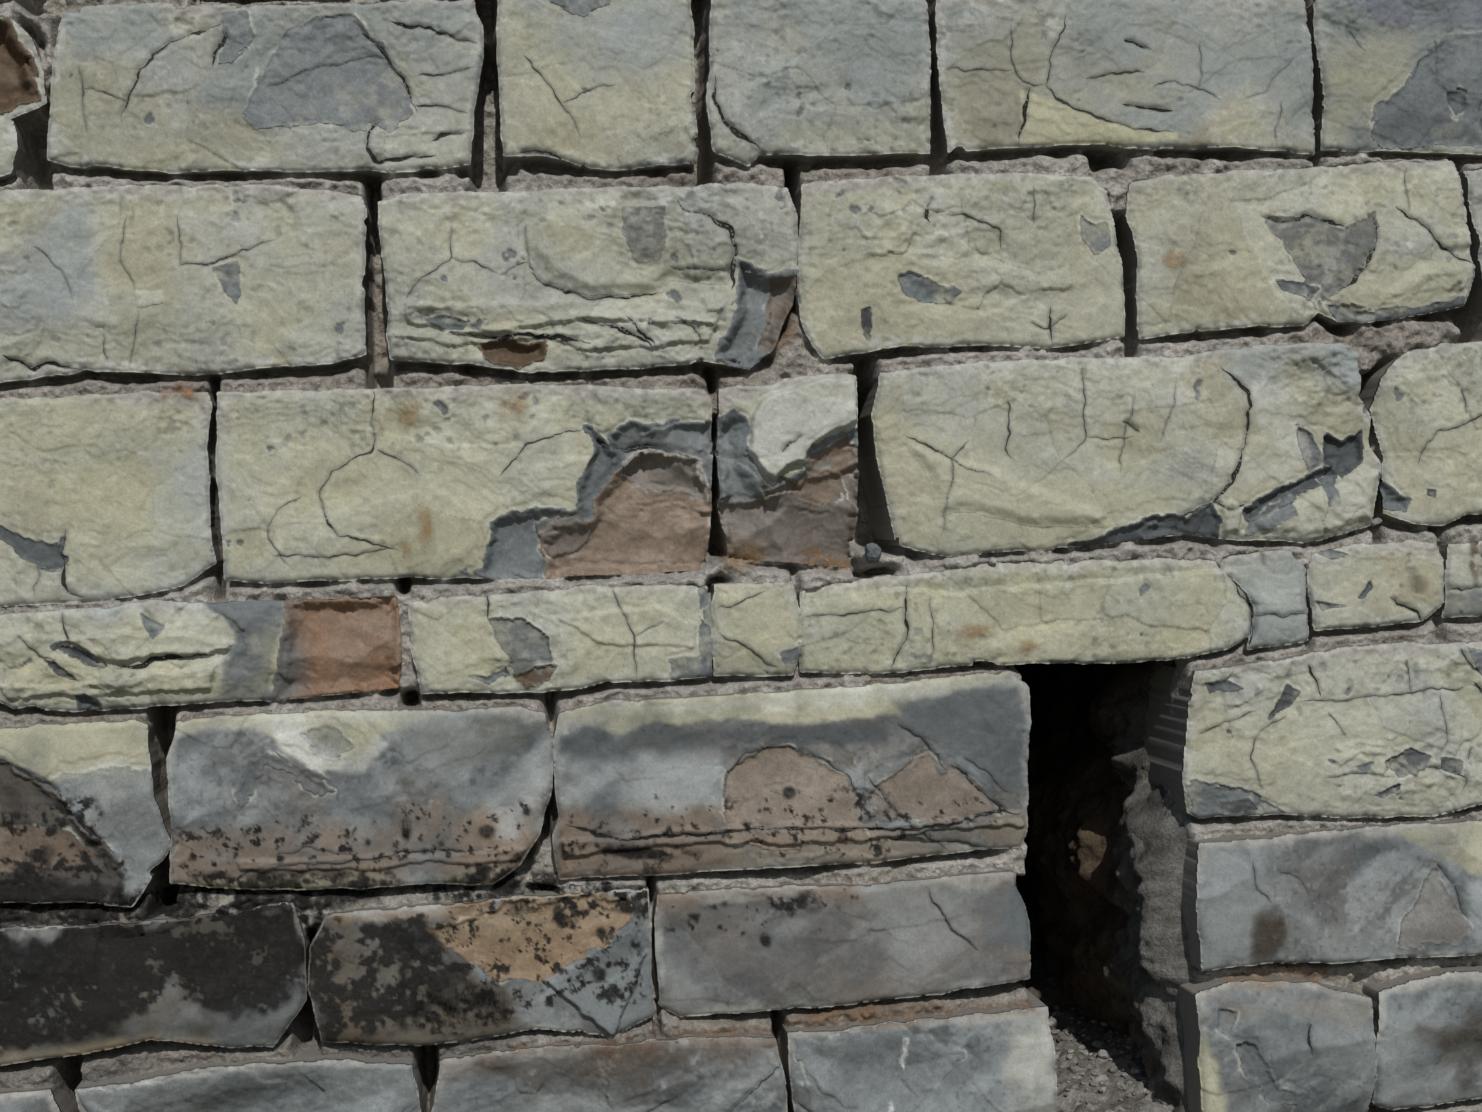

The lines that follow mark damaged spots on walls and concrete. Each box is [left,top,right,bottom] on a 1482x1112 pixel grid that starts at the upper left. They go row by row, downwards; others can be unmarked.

spalling [0,18,41,115]
crack [80,24,227,131]
crack [265,21,473,164]
crack [3,220,138,370]
crack [407,198,737,346]
spalling [460,376,882,689]
crack [909,403,1011,536]
crack [1164,368,1252,522]
spalling [272,597,402,702]
crack [1202,648,1482,793]
spalling [0,761,176,906]
spalling [722,745,1002,851]